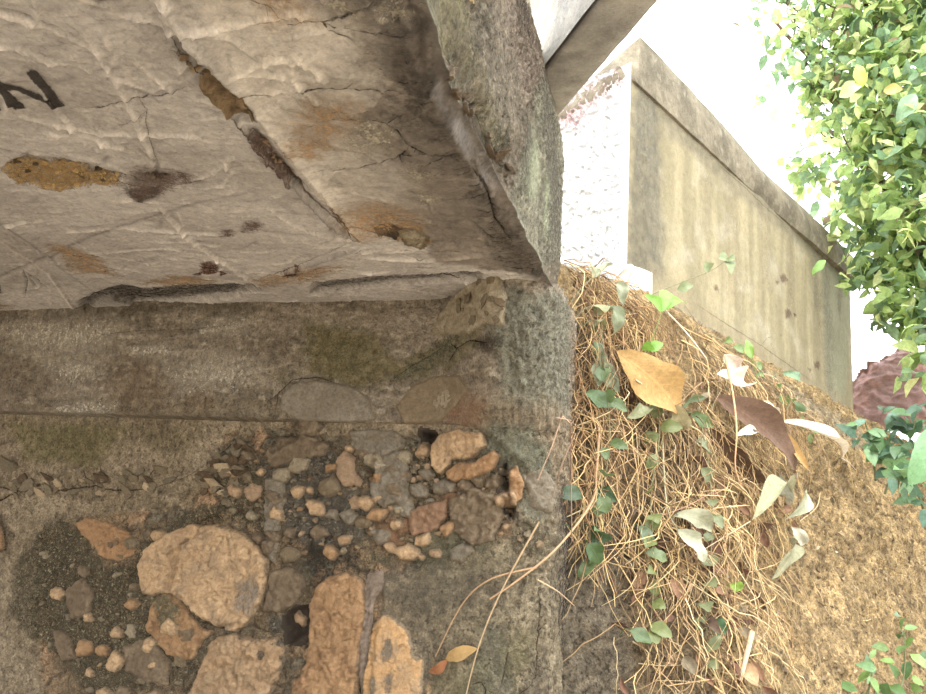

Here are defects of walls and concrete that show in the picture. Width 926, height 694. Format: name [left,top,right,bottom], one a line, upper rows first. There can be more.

crack [256,2,411,38]
crack [76,39,203,159]
crack [235,115,506,254]